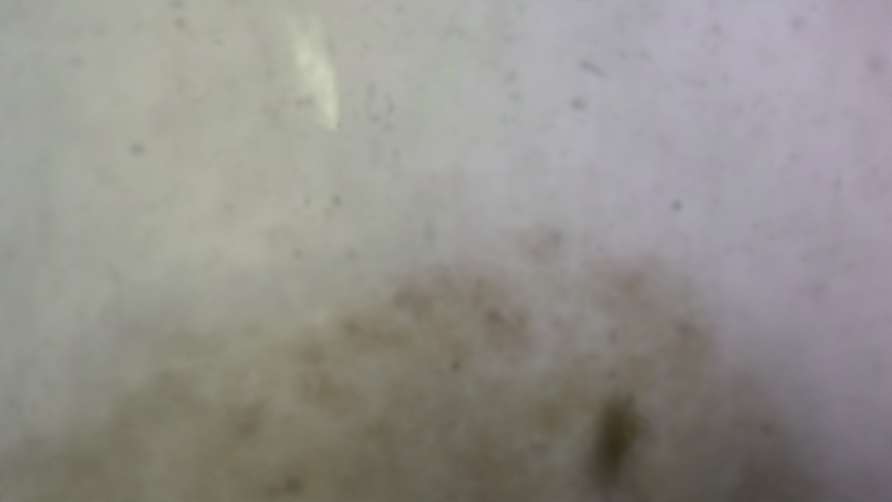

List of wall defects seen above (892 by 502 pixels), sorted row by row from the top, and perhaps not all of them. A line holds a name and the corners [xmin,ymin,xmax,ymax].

water stain [486,367,704,502]